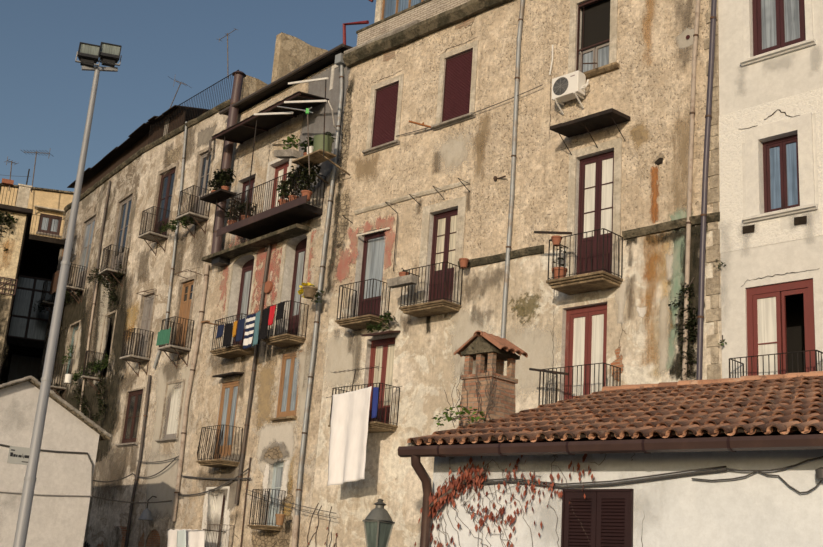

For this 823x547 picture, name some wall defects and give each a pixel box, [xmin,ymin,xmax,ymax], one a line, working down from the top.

spalling [333,89,395,283]
rust [651,166,659,223]
leakage [0,294,8,364]
rust [645,237,658,360]
spalling [610,347,623,382]